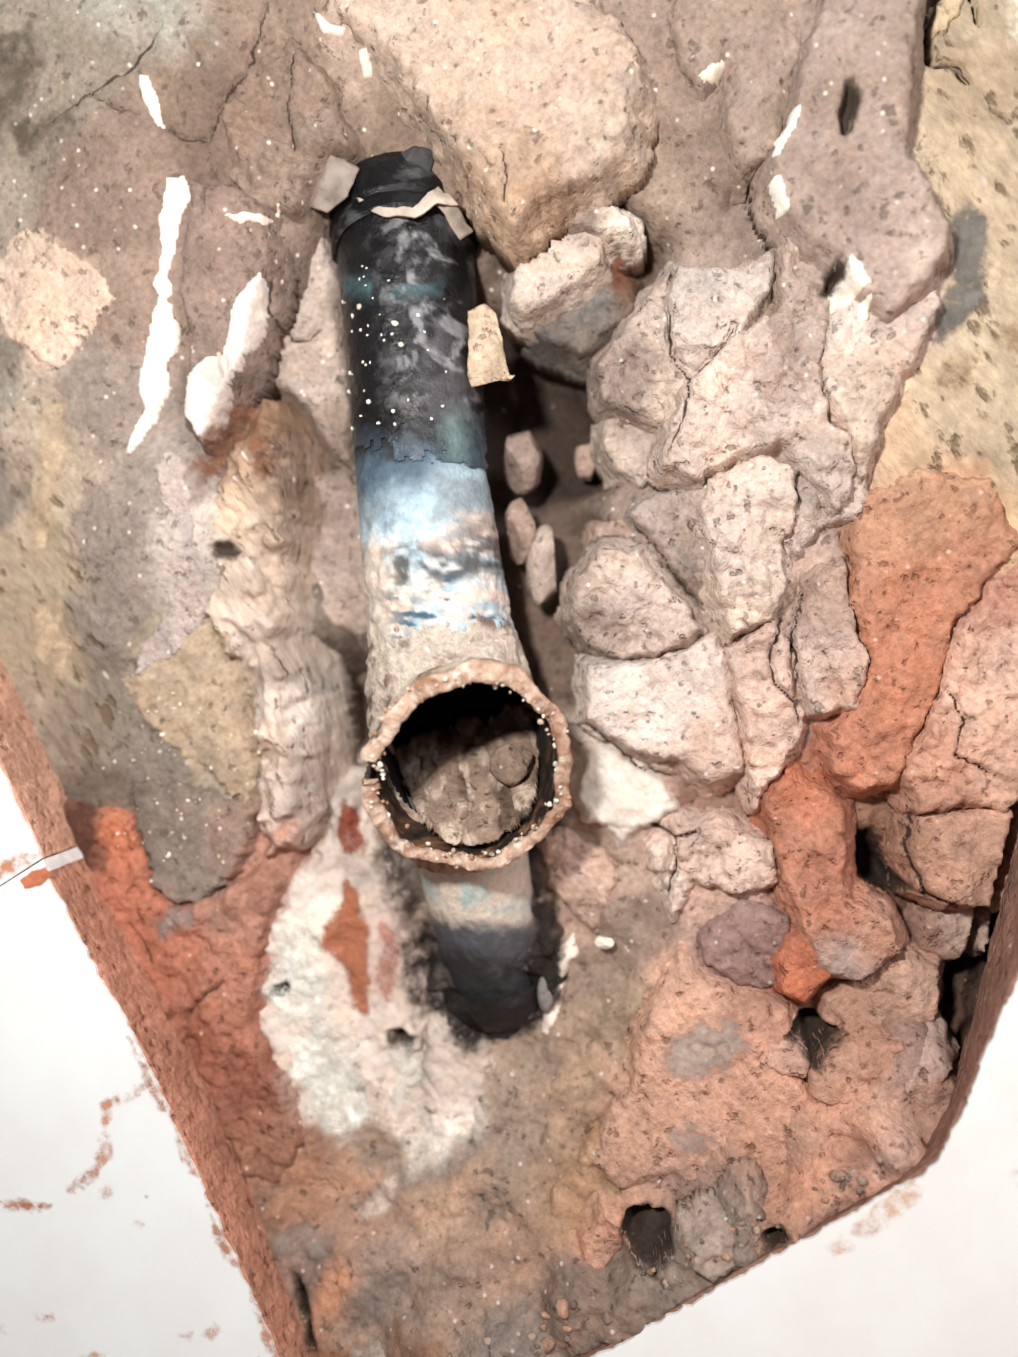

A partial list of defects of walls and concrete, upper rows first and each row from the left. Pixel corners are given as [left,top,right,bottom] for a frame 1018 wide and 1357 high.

flaking render [126,175,270,454]
peeling [467,304,515,387]
crack [667,308,734,449]
crack [768,599,802,721]
spalling [810,467,1018,816]
crack [567,723,671,776]
rust [337,801,364,853]
spalling [63,798,305,1184]
leakage [224,821,368,1147]
rust [321,879,398,1014]
leakage [401,887,565,1051]
leakage [361,1176,397,1219]